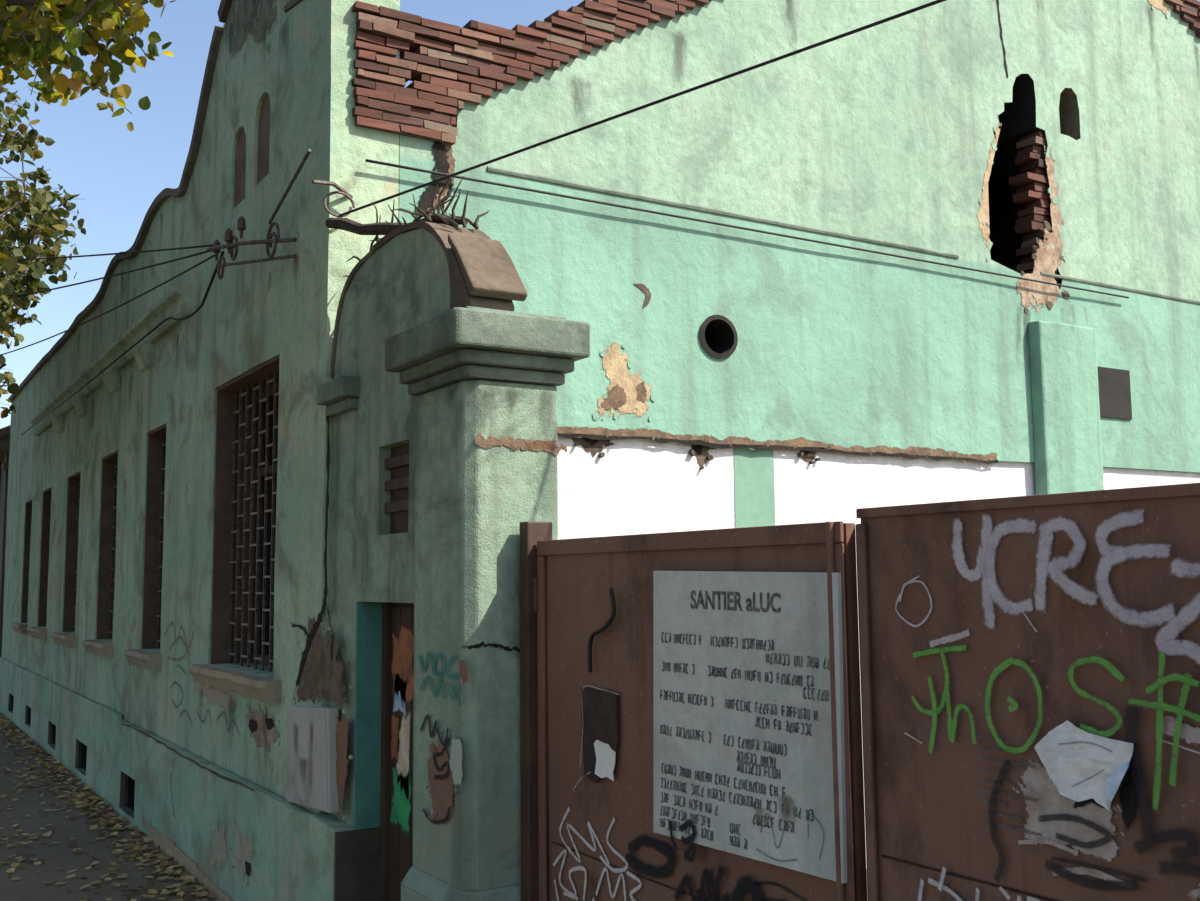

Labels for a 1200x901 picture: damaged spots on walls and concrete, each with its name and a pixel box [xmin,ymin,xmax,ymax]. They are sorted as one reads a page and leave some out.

crack [418,141,456,214]
spalling [977,123,1002,262]
spalling [1016,146,1070,313]
spalling [475,342,998,470]
crack [462,641,520,653]